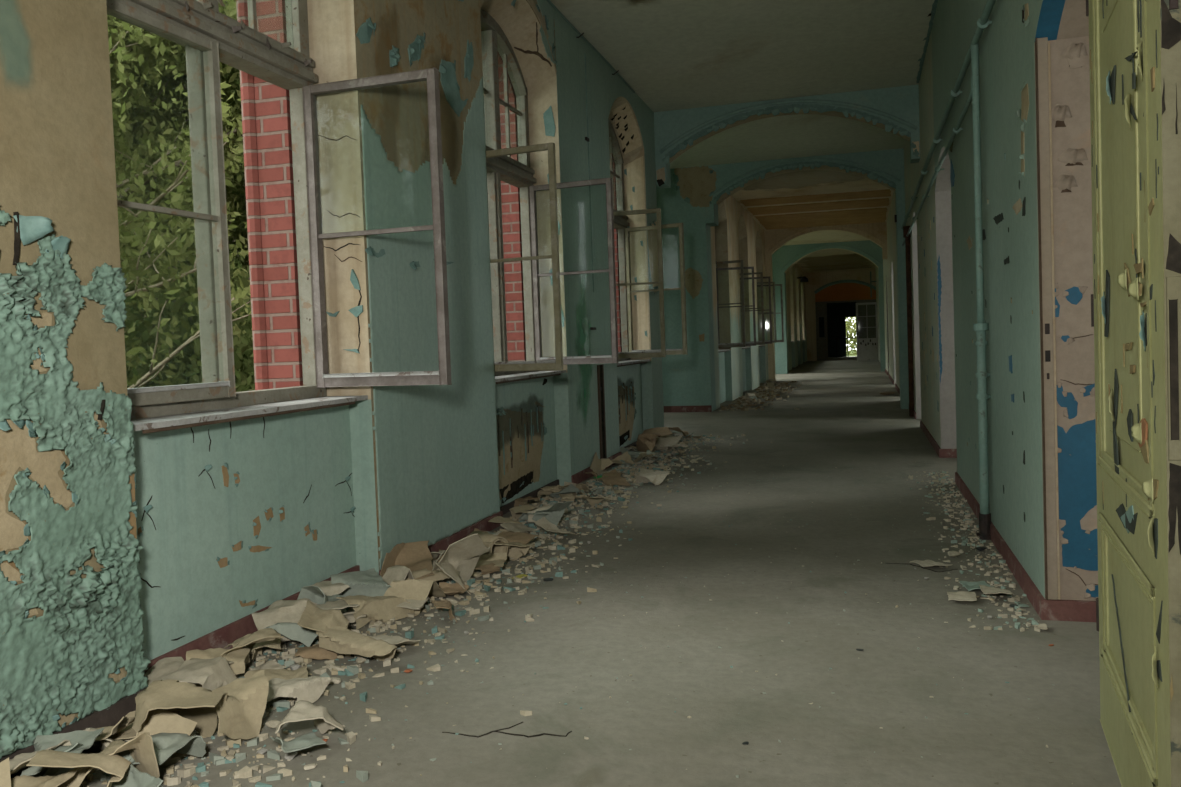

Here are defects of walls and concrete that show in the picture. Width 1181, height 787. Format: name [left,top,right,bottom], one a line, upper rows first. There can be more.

peeling [1051,101,1072,127]
peeling [972,82,1029,242]
peeling [1053,147,1088,193]
crack [12,212,20,265]
peeling [326,77,547,570]
peeling [1055,283,1088,317]
peeling [1109,369,1142,474]
peeling [0,210,151,759]
peeling [222,462,240,487]
peeling [1056,382,1098,601]
peeling [216,505,285,568]
crack [442,722,572,738]